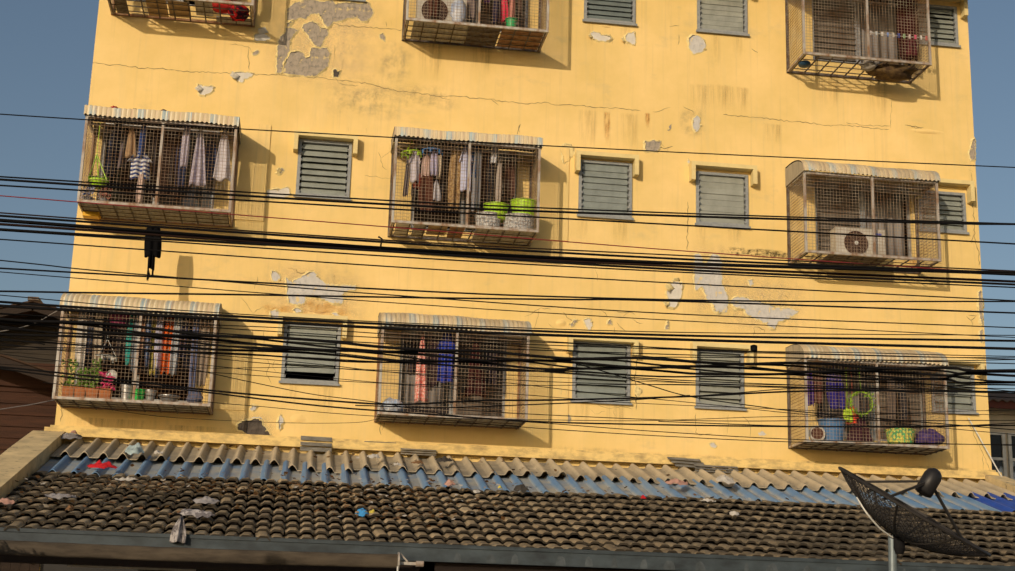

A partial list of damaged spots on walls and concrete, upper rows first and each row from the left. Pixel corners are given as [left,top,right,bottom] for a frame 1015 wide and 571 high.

peeling [252,0,374,78]
peeling [588,31,637,46]
peeling [686,34,707,55]
peeling [195,83,216,97]
peeling [230,70,255,83]
peeling [268,270,357,320]
peeling [663,253,799,331]
peeling [235,404,285,435]